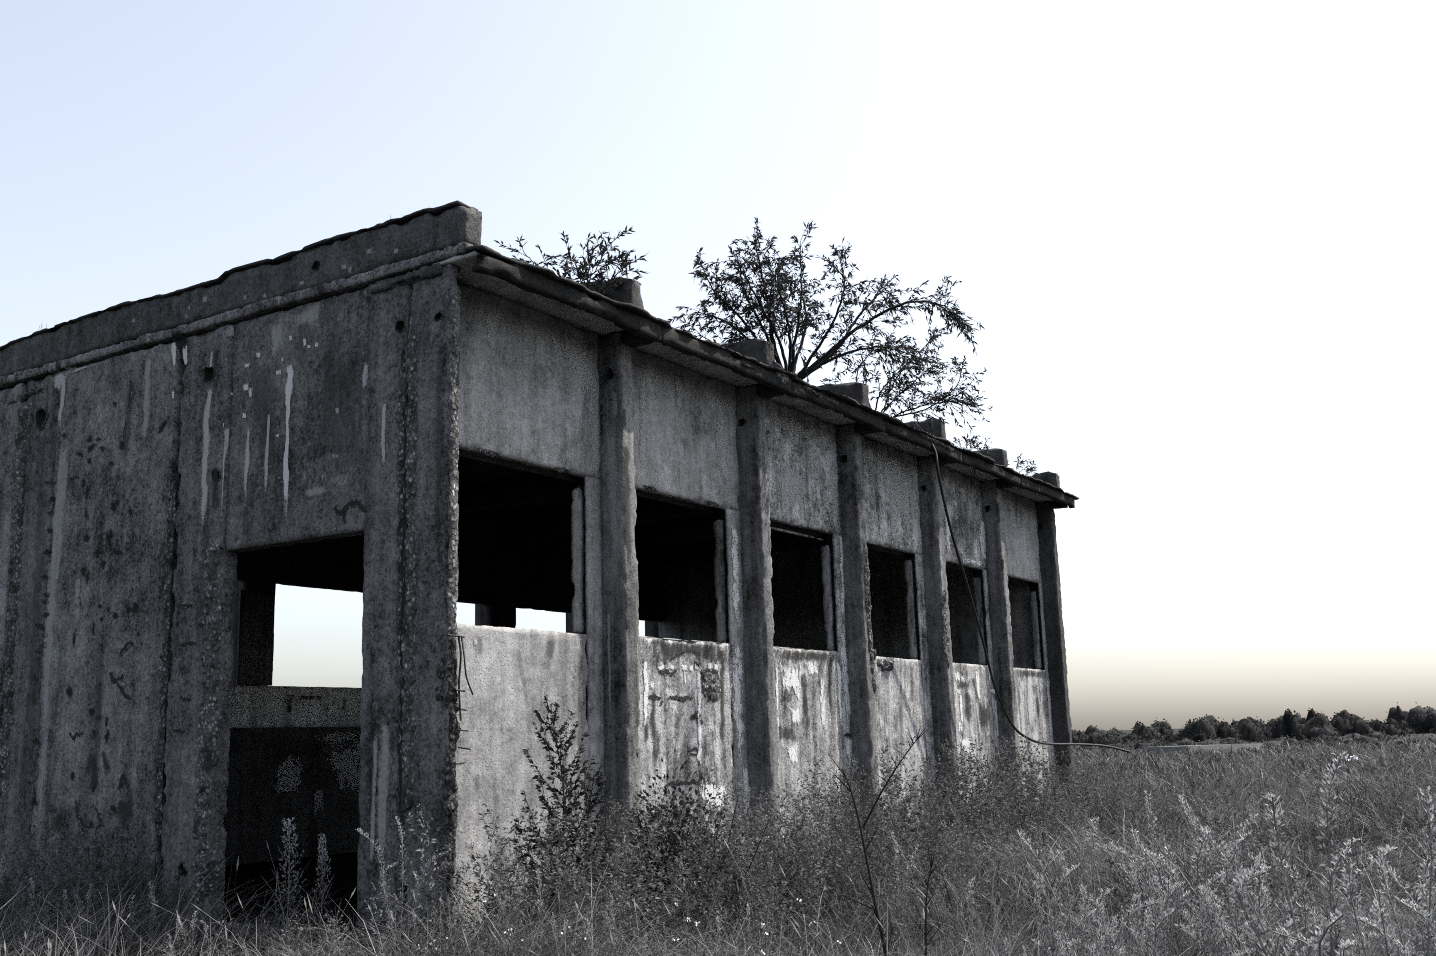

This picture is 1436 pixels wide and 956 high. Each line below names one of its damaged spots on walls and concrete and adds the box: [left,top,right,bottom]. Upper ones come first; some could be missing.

damp [143,360,151,436]
damp [171,342,187,365]
damp [201,350,229,523]
damp [244,305,319,512]
damp [38,448,67,832]
damp [640,637,737,767]
damp [86,745,109,794]